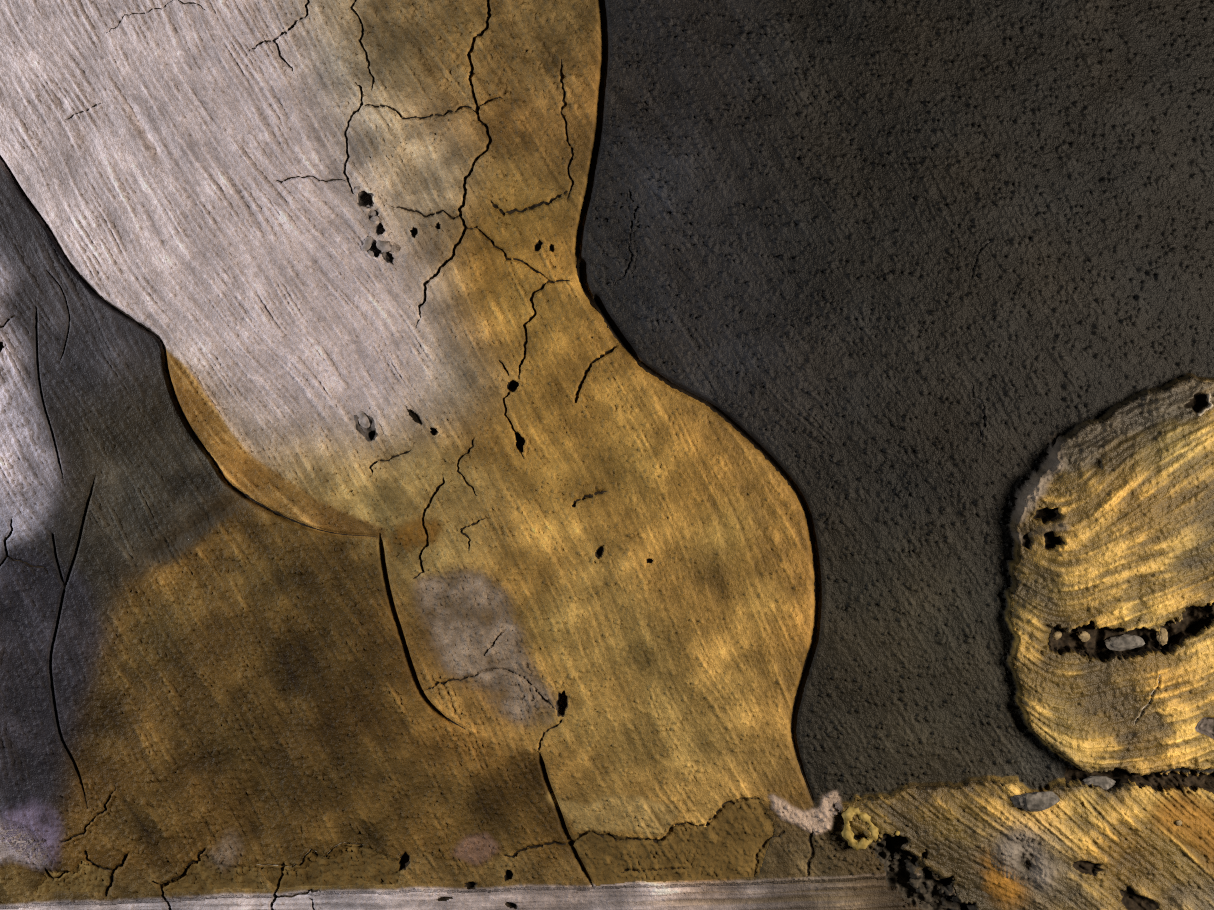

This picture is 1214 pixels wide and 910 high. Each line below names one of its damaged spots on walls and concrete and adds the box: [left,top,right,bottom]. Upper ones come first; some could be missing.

crack [252,0,310,74]
crack [276,0,574,459]
crack [575,343,618,403]
spalling [1184,392,1213,416]
crack [369,450,411,475]
crack [0,517,48,572]
crack [413,439,485,579]
spalling [1022,508,1065,550]
spalling [1195,717,1214,740]
crack [271,864,321,910]
spalling [1073,861,1103,876]
spalling [1120,886,1159,910]